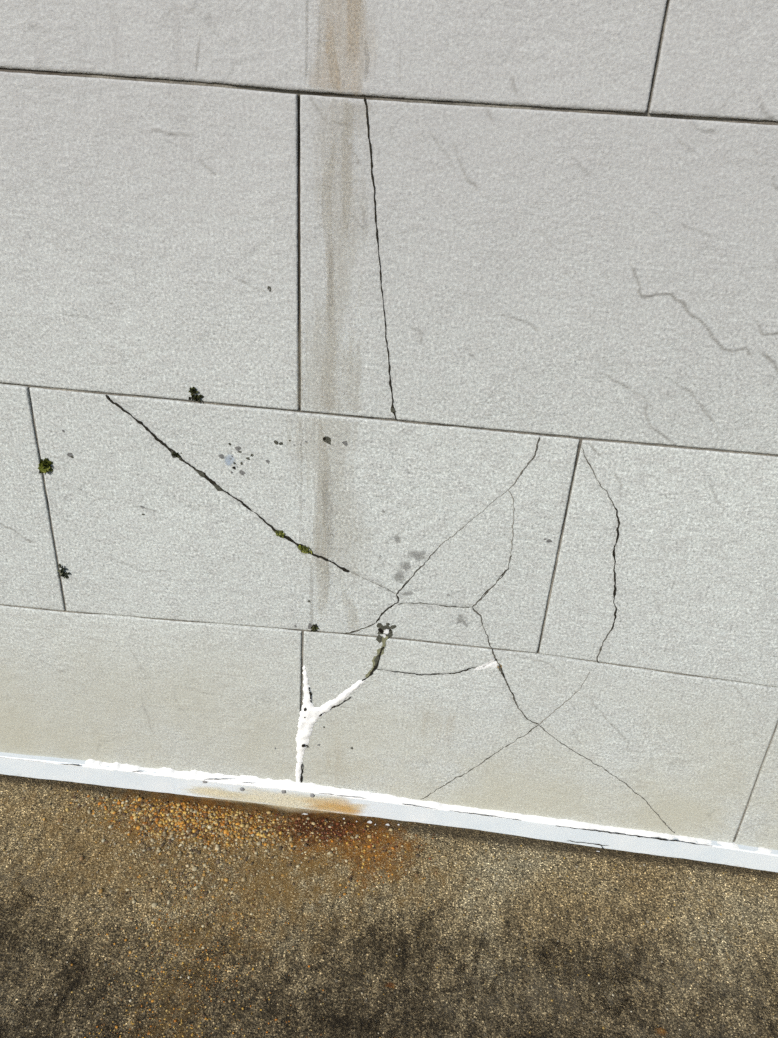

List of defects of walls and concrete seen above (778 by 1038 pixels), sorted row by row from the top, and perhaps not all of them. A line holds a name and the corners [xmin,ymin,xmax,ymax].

crack [364,97,396,420]
crack [106,395,708,851]
rust [132,788,411,881]